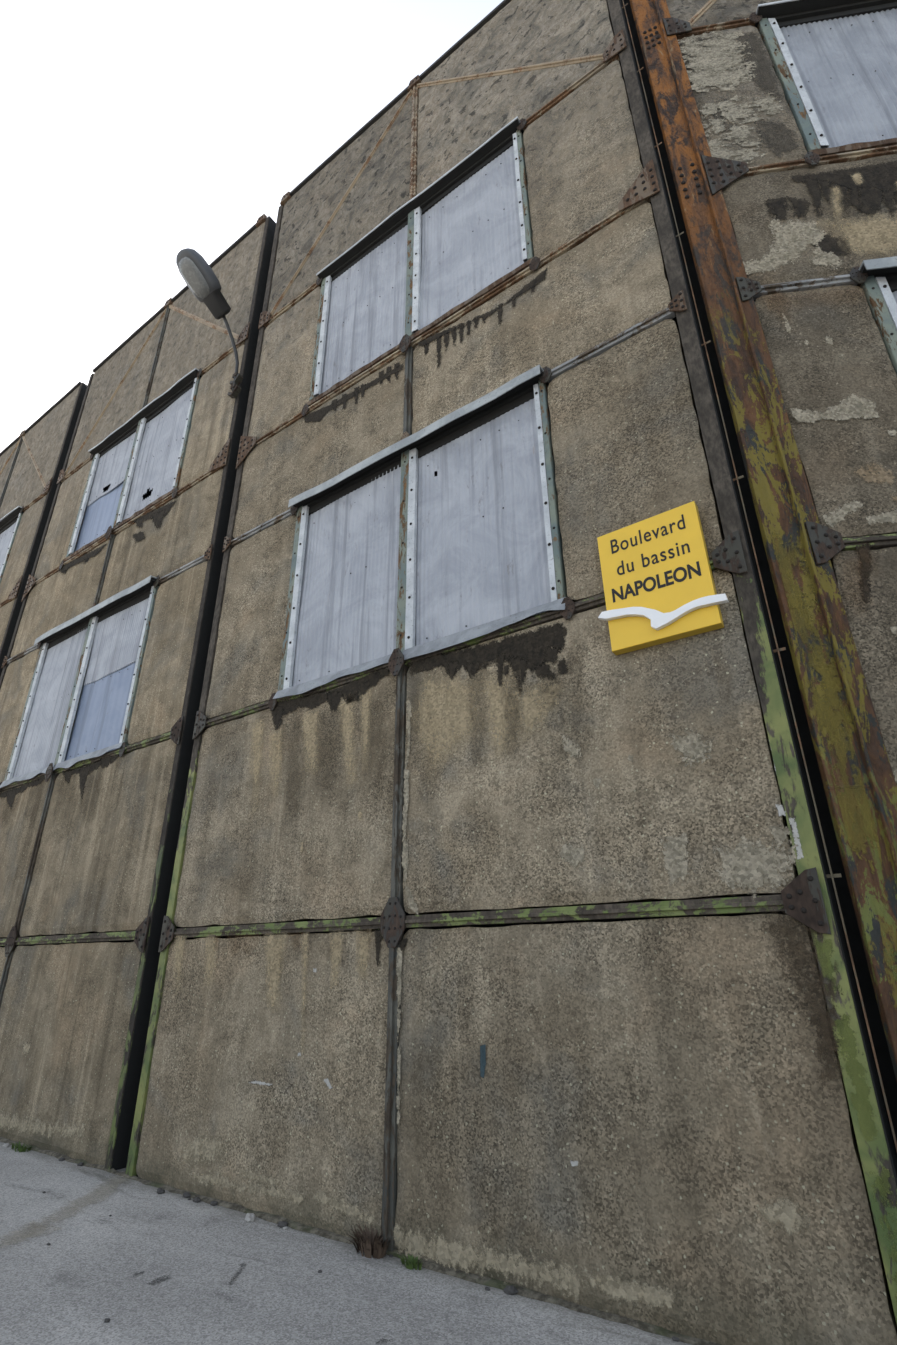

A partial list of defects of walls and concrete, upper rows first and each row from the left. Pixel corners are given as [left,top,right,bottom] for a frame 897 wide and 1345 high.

spalling [678,30,785,164]
spalling [743,219,843,275]
spalling [790,393,897,436]
leakage [253,668,389,790]
leakage [407,621,568,765]
corrosion [763,910,845,1091]